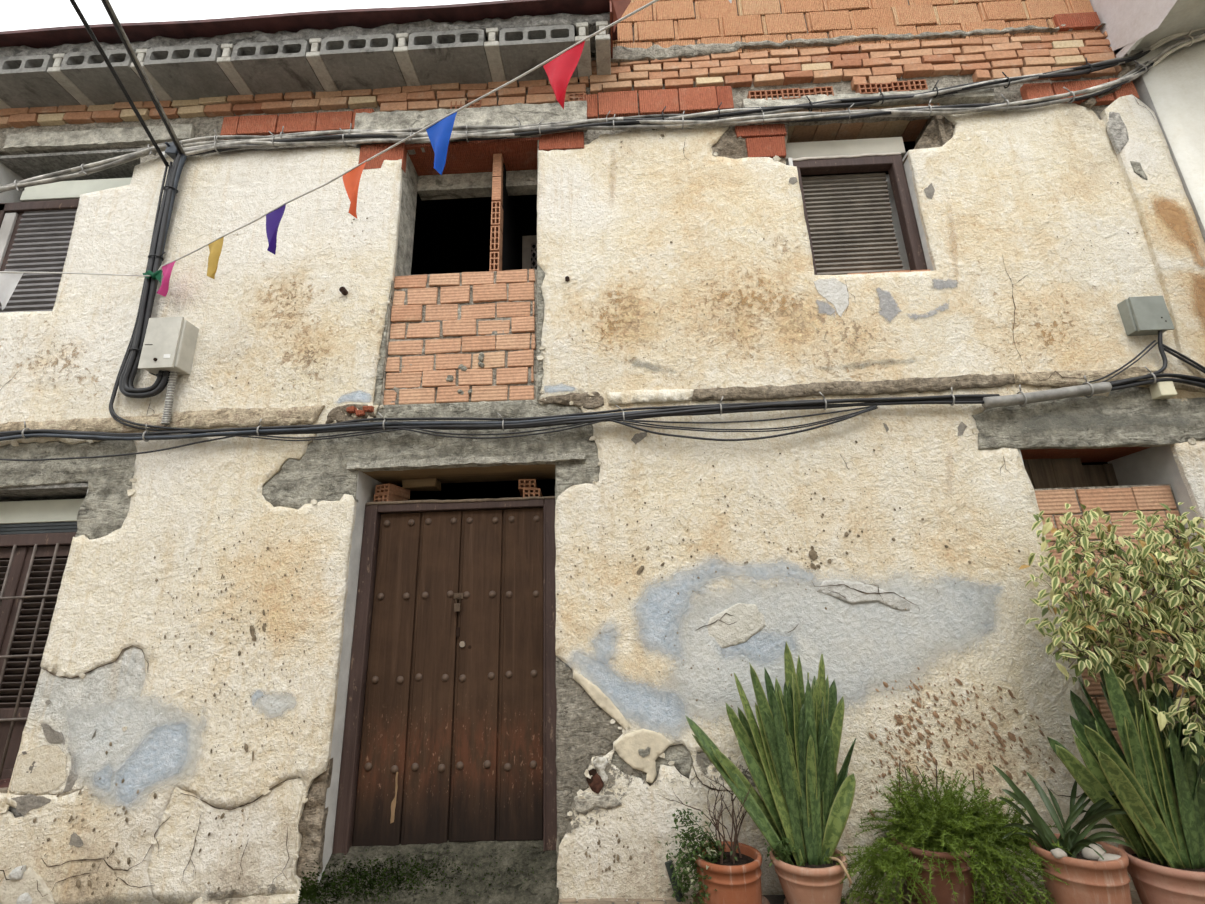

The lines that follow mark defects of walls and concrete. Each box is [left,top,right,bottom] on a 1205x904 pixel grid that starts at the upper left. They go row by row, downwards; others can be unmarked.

peeling [814,278,861,339]
peeling [876,279,958,322]
crack [811,580,938,611]
peeling [555,561,996,861]
peeling [0,646,333,904]
crack [0,778,297,897]